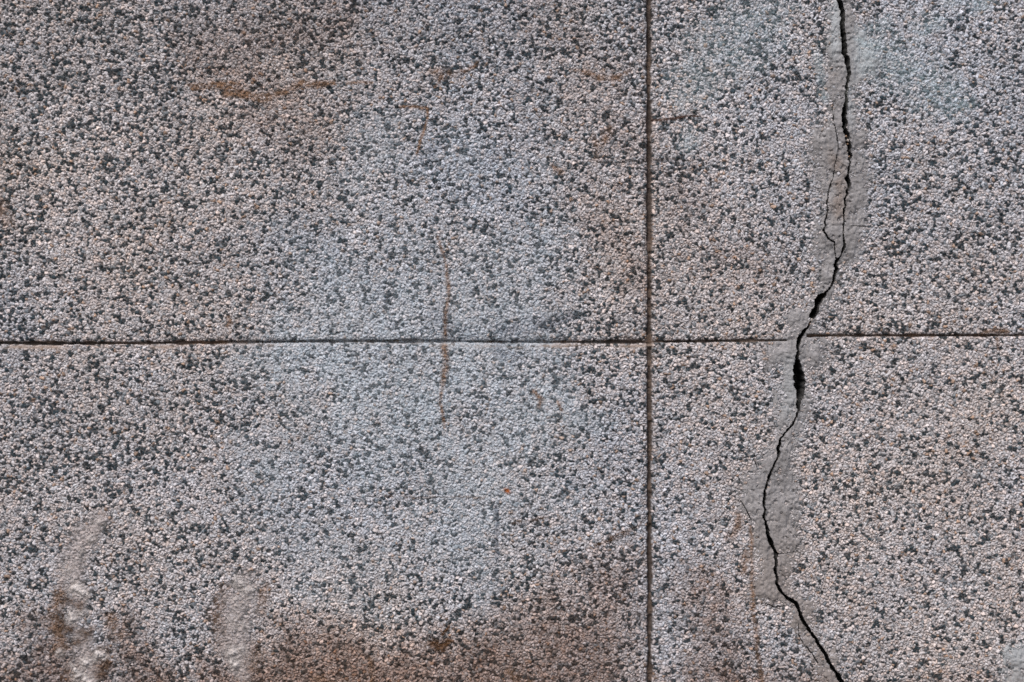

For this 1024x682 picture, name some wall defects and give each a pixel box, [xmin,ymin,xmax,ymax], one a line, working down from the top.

leakage [62,514,107,682]
crack [740,0,869,682]